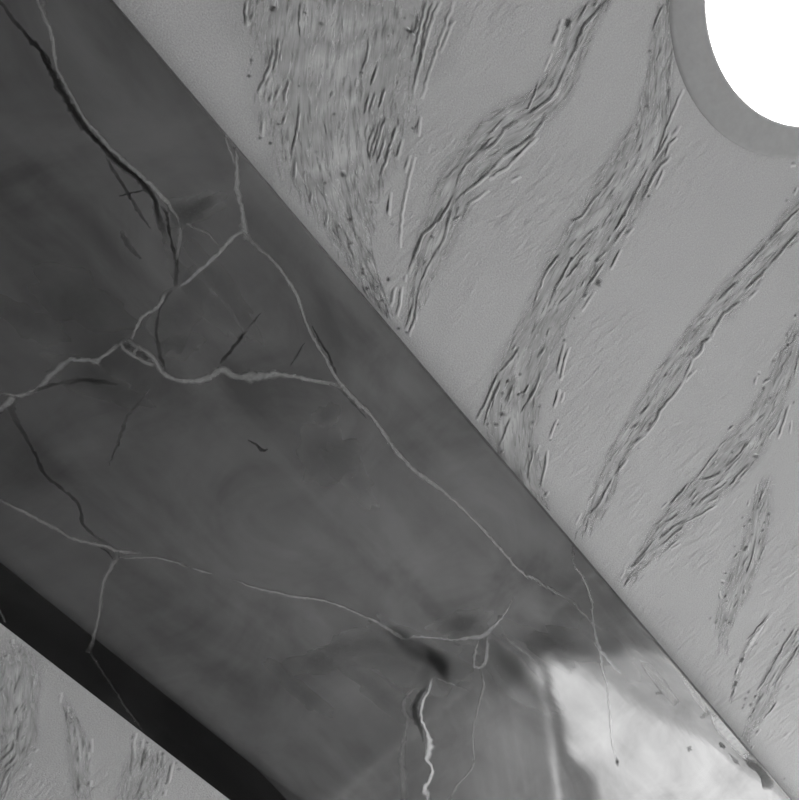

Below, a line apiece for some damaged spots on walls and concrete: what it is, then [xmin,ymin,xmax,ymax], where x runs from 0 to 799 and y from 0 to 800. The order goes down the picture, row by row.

crack [17,24,243,282]
crack [412,692,434,794]